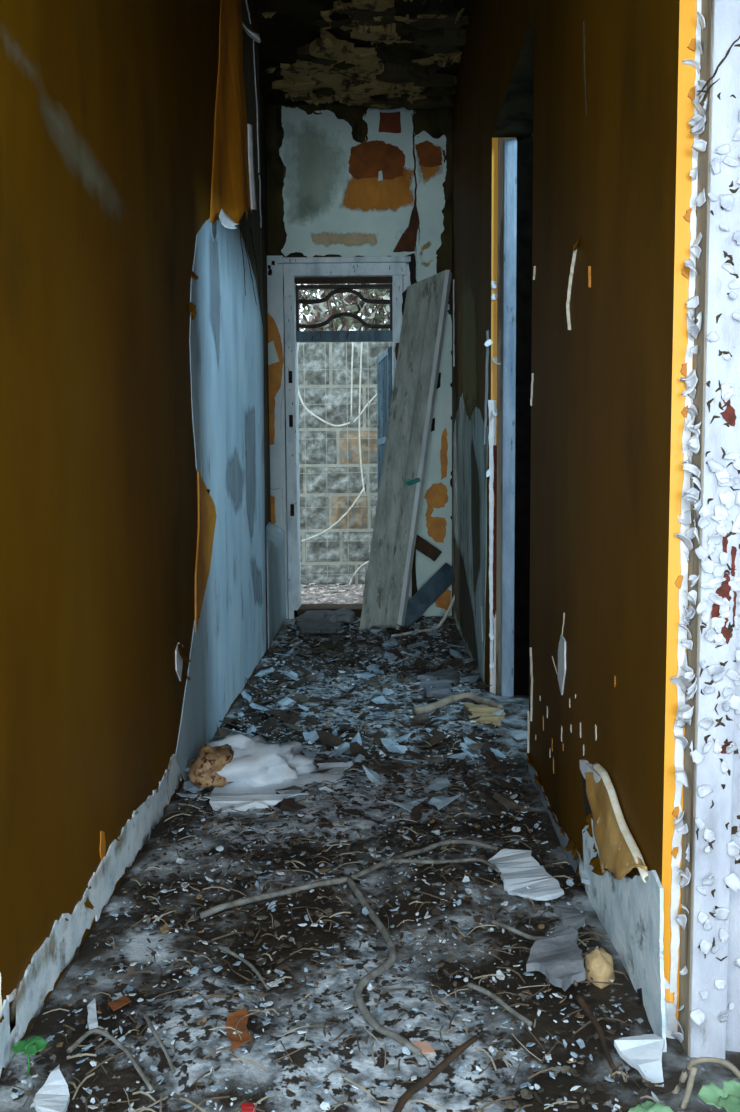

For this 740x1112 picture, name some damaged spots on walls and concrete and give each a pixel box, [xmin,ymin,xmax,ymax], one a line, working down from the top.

peeling [707,112,740,211]
peeling [0,0,469,1076]
peeling [416,299,500,694]
peeling [691,452,740,774]
peeling [697,785,713,798]
flaking render [526,647,677,1052]
peeling [695,815,740,896]
peeling [698,908,730,954]
peeling [690,979,735,1026]